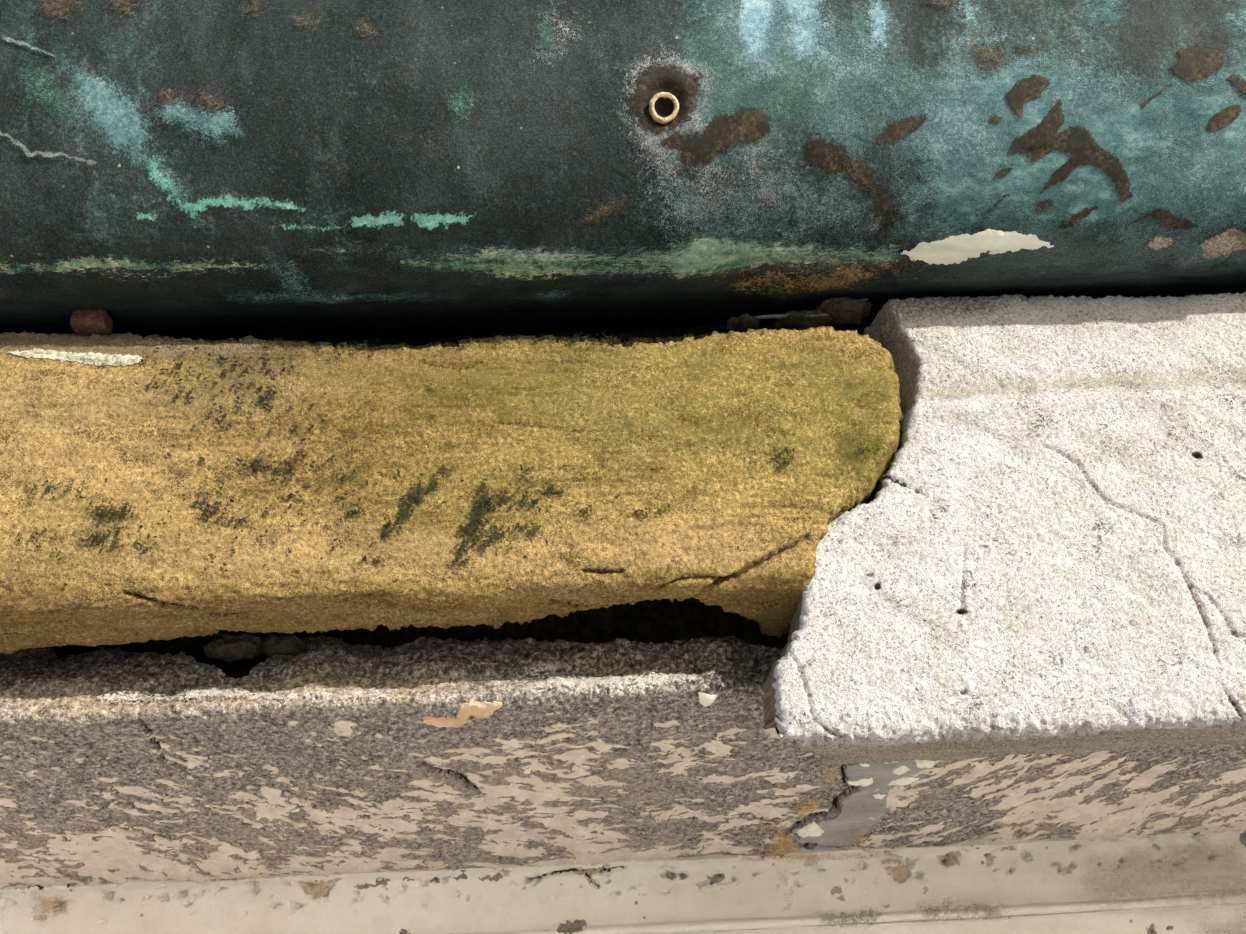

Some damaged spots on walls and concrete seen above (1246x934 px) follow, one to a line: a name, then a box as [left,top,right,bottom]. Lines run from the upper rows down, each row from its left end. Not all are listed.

crack [1045,447,1246,654]
peeling [0,708,847,901]
peeling [845,751,1246,884]